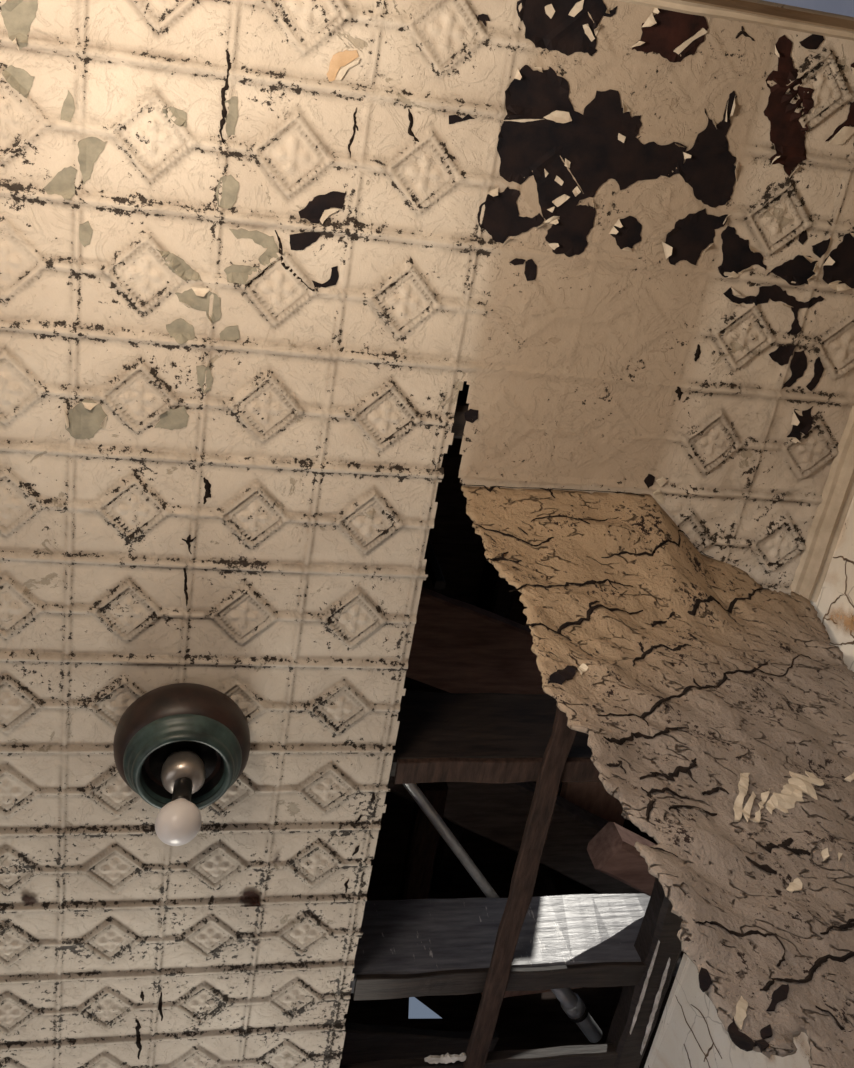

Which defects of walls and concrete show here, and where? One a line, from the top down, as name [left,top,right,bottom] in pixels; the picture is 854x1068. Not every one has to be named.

peeling [516,0,617,56]
peeling [629,8,708,63]
crack [219,50,231,144]
peeling [764,34,824,178]
peeling [44,137,107,199]
peeling [156,249,240,344]
peeling [224,191,346,284]
peeling [312,266,339,288]
peeling [477,65,854,391]
crack [461,484,769,667]
crack [597,556,854,820]
crack [746,838,811,874]